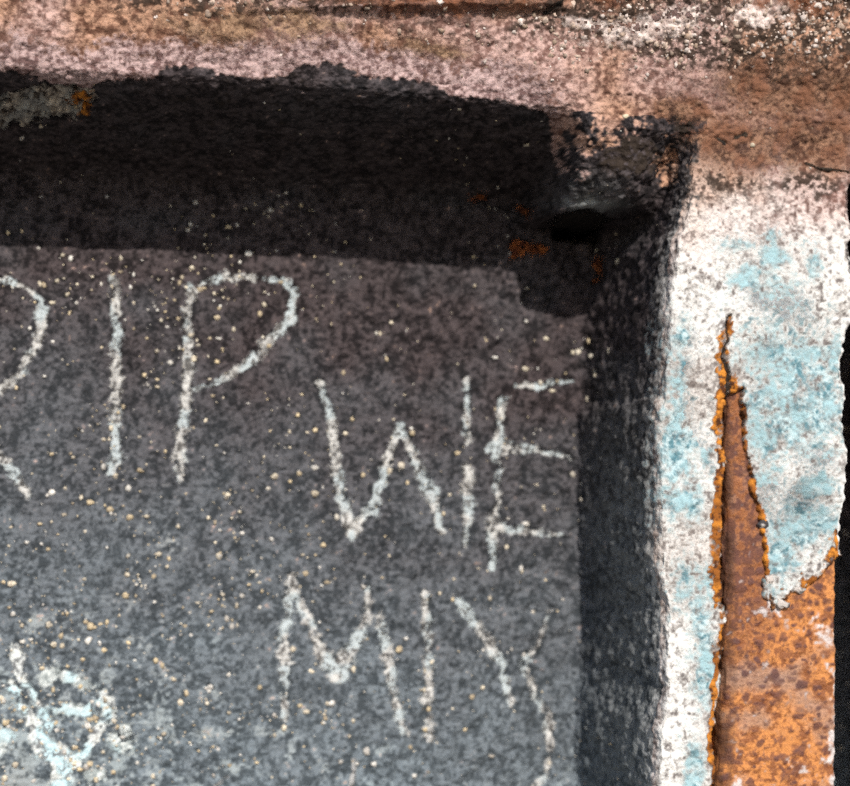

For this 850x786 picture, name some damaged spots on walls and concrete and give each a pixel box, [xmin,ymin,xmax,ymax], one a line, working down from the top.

corrosion [706,316,744,786]
corrosion [739,404,771,580]
peeling [727,229,844,610]
corrosion [799,528,838,588]